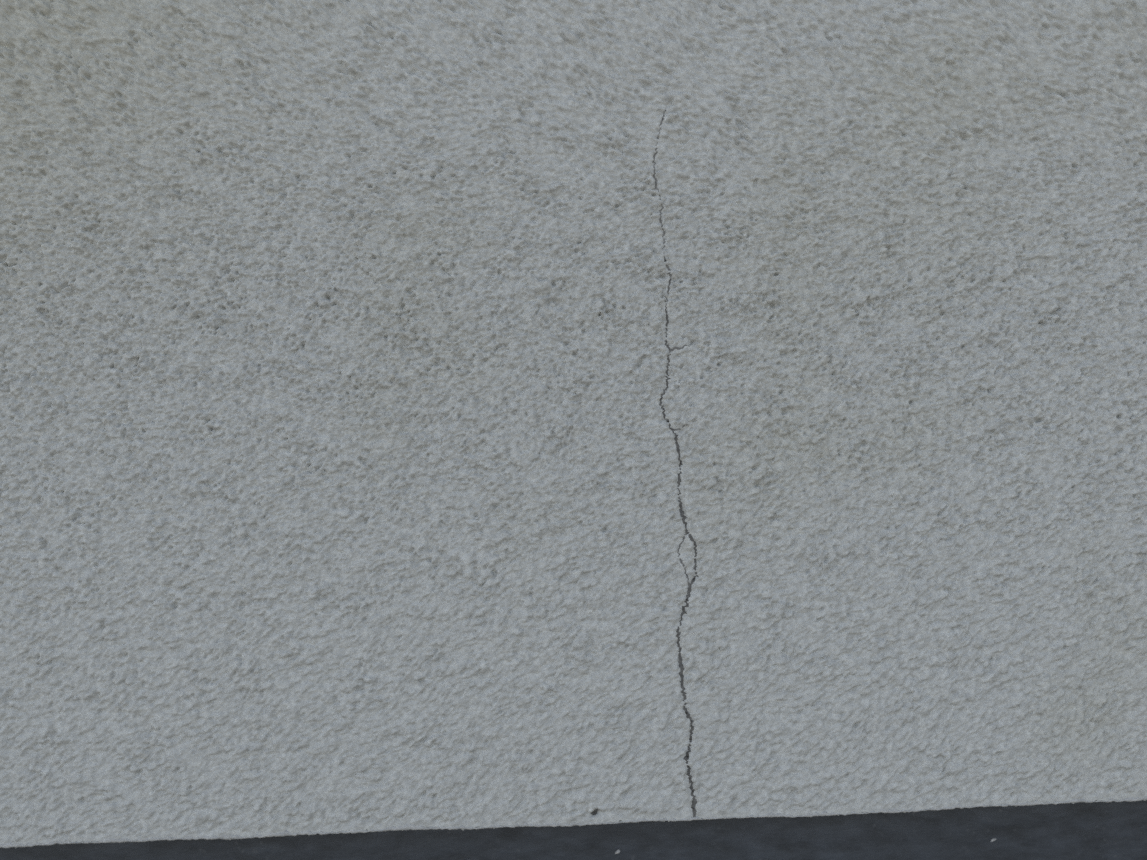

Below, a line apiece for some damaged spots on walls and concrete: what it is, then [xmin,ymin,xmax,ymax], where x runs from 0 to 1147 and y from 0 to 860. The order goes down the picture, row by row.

crack [653,108,698,817]